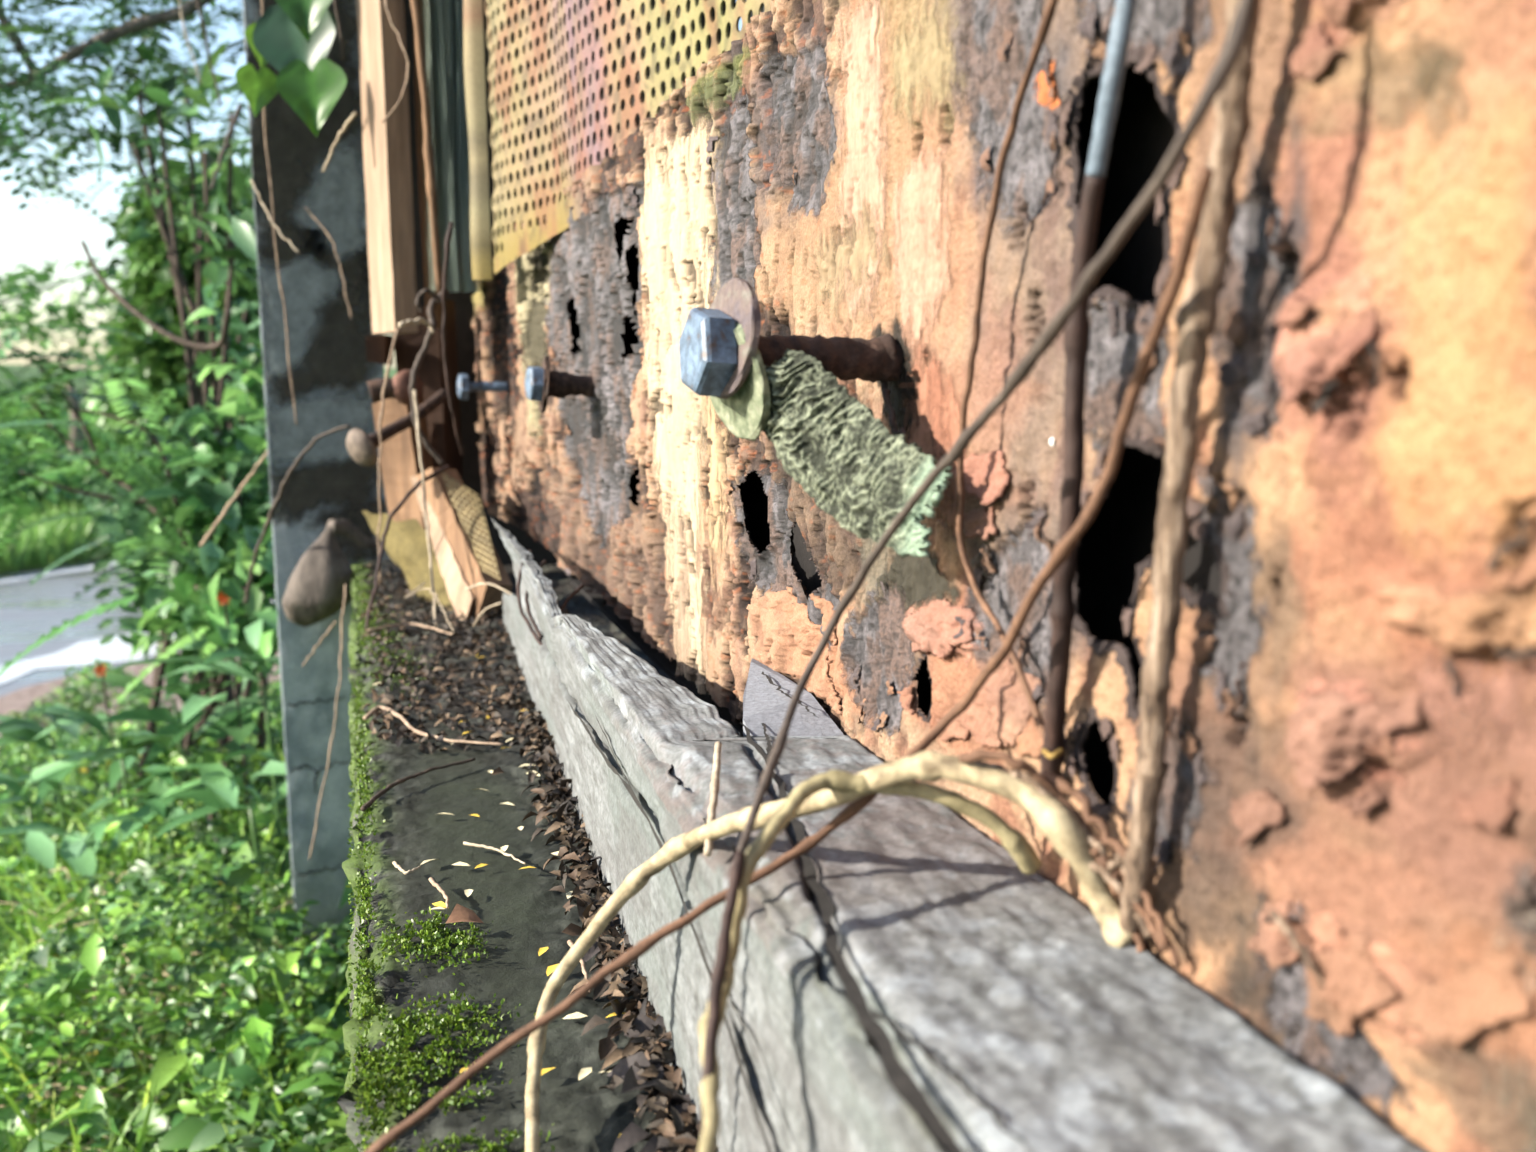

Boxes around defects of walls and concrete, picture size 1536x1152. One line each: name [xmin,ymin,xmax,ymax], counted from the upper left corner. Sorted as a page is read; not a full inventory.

spalling [706,43,837,296]
spalling [953,0,1071,237]
spalling [1128,0,1214,88]
peeling [1285,0,1378,83]
spalling [544,181,645,550]
spalling [1081,257,1174,507]
spalling [1210,167,1380,440]
spalling [723,450,1056,760]
spalling [1187,461,1271,741]
crack [741,672,1030,1152]
peeling [1228,789,1286,847]
peeling [1247,899,1536,1116]